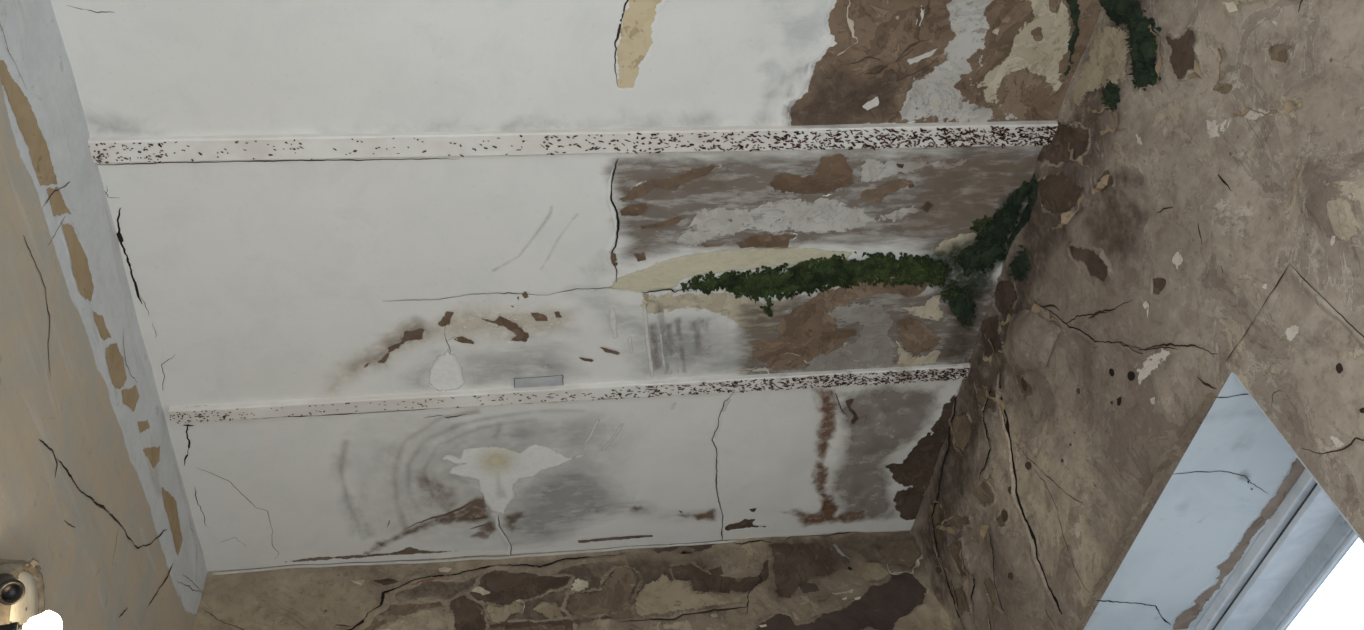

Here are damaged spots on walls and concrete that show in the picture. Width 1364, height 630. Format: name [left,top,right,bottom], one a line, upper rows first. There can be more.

peeling [768,0,1130,230]
peeling [0,60,150,433]
peeling [741,277,931,372]
water stain [610,84,1104,600]
crack [1033,301,1283,407]
crack [333,514,625,630]
water stain [379,444,594,546]
spalling [345,565,644,630]
crack [712,393,894,550]
spalling [578,371,1035,630]
crack [987,368,1170,627]
crack [1300,437,1364,454]